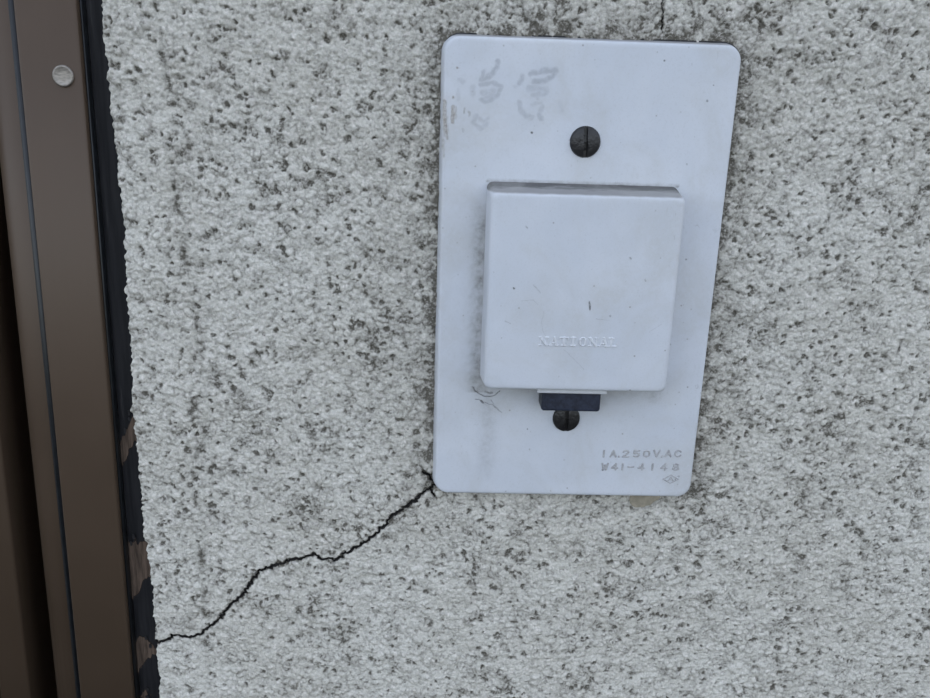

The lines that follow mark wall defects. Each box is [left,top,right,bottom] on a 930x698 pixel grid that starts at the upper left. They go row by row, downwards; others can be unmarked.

crack [156,471,435,644]